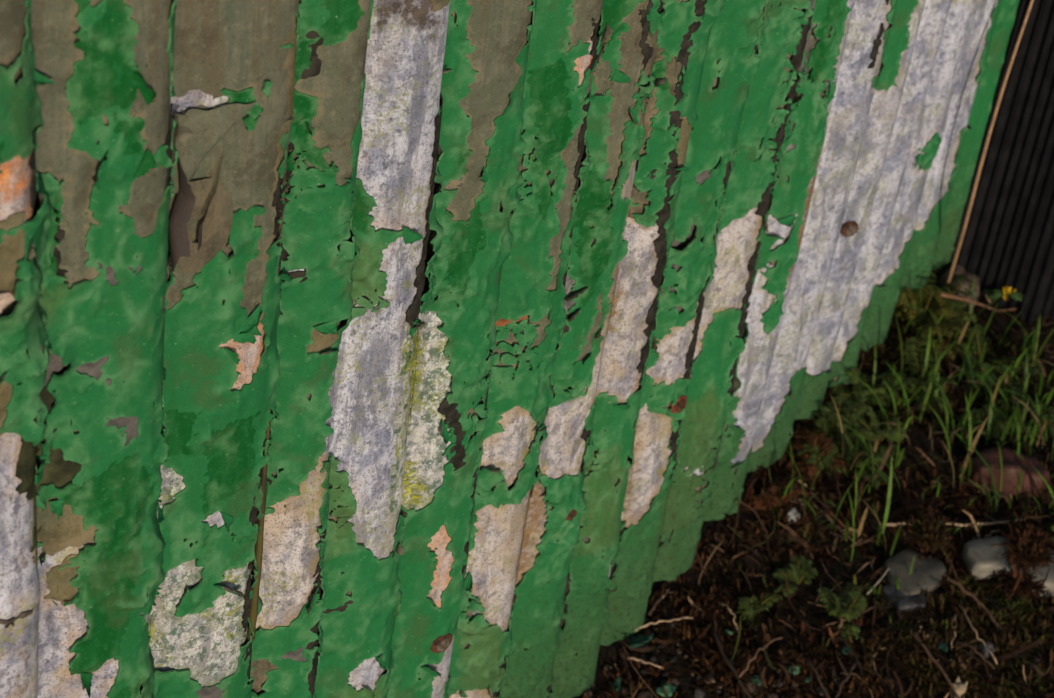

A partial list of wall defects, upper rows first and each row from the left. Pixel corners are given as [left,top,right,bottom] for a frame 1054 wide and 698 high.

rust [0,162,26,197]
peeling [0,0,118,295]
peeling [0,370,119,698]
peeling [40,345,111,386]
peeling [106,416,138,445]
peeling [118,0,533,698]
peeling [427,0,998,633]